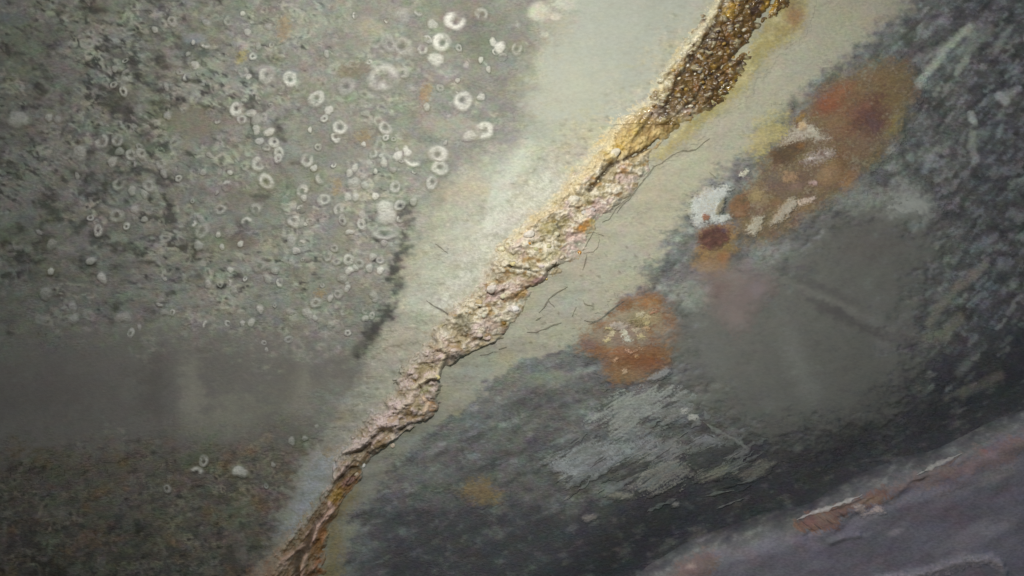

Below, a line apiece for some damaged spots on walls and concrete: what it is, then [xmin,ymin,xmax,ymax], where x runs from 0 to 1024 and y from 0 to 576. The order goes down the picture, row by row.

rust [688,46,929,258]
crack [530,138,710,333]
crack [426,300,449,316]
rust [569,282,683,396]
spalling [790,480,896,538]